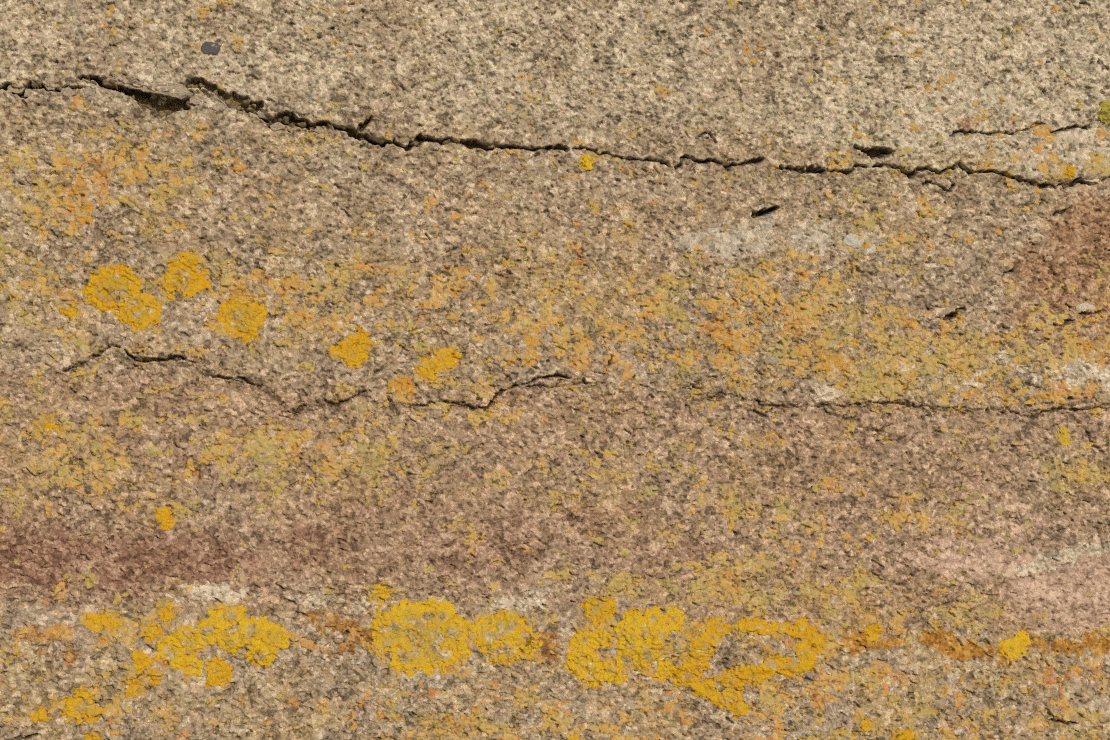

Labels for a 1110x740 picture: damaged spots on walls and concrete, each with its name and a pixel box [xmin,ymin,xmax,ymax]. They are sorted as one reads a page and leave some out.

crack [0,74,227,111]
crack [255,110,1110,215]
crack [63,345,250,384]
crack [281,364,385,415]
crack [415,361,609,411]
crack [682,384,1110,449]